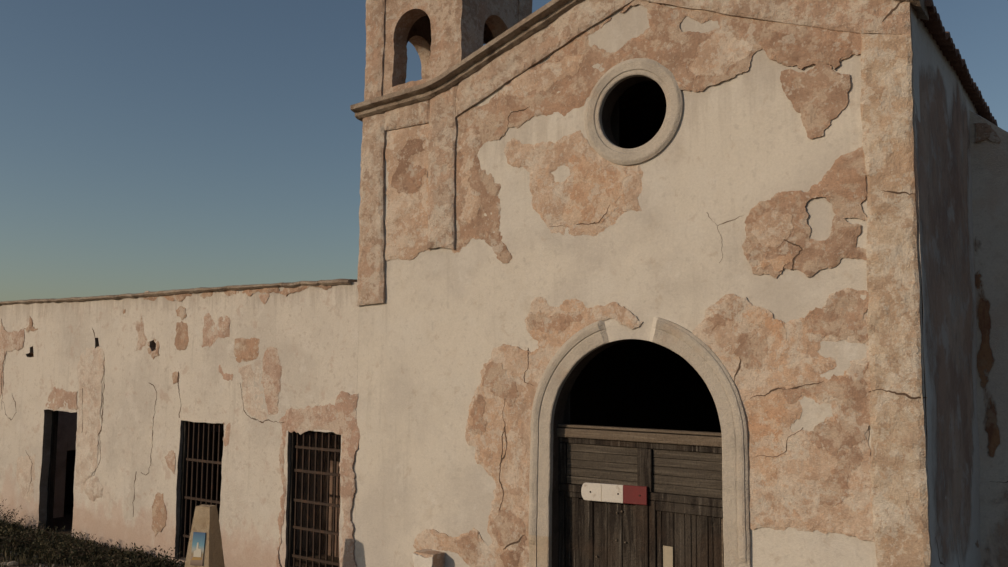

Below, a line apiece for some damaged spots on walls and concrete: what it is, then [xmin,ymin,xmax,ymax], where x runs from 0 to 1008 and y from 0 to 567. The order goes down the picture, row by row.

flaking render [384,123,431,261]
flaking render [452,0,867,278]
flaking render [0,317,38,397]
flaking render [46,346,105,493]
flaking render [143,285,332,350]
flaking render [202,313,360,567]
crack [499,402,507,510]
flaking render [413,297,643,567]
crack [734,359,823,400]
flaking render [692,288,875,542]
crack [869,389,927,399]
damp [914,70,974,563]